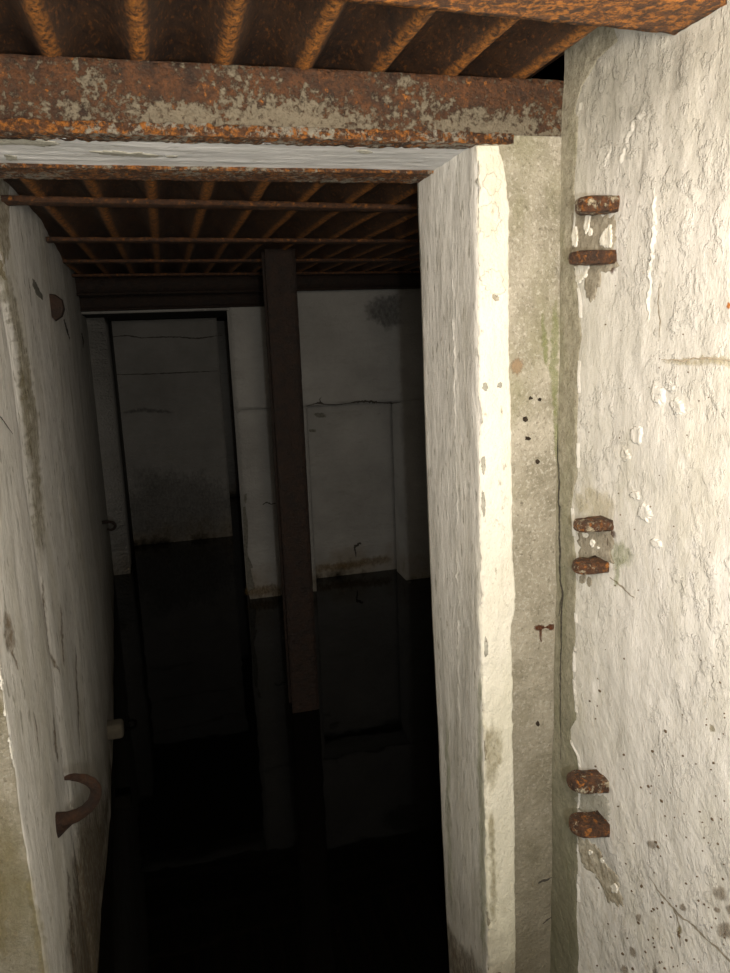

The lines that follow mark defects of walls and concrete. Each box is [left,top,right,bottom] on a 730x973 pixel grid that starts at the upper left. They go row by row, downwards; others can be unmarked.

crack [556,413,564,760]